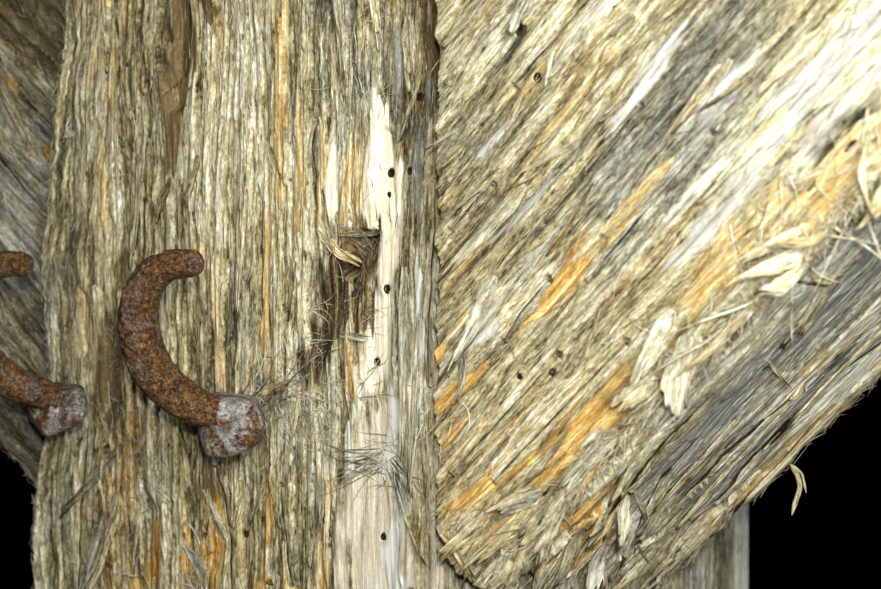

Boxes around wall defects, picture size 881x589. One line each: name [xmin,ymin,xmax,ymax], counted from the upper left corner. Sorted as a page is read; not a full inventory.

crack [0,152,47,220]